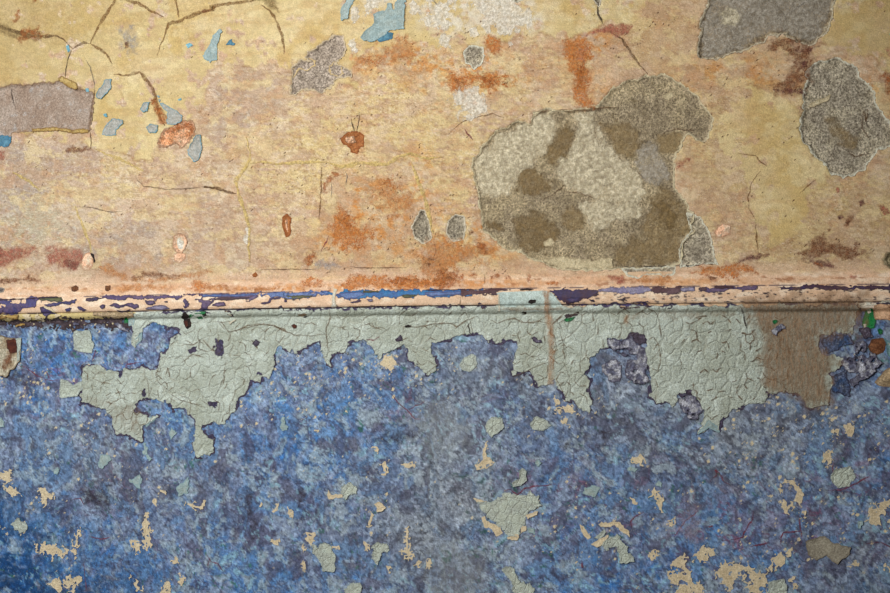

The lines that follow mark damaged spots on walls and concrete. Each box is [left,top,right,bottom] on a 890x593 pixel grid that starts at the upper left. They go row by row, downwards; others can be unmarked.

flaking render [697,0,835,61]
flaking render [289,35,352,97]
rust [448,72,508,94]
rust [562,39,594,108]
rust [770,38,813,97]
crack [0,0,442,270]
rust [328,206,374,251]
rust [341,232,493,290]
peeling [0,57,890,461]
crack [84,301,840,434]
peeling [473,468,542,540]
peeling [667,545,798,593]